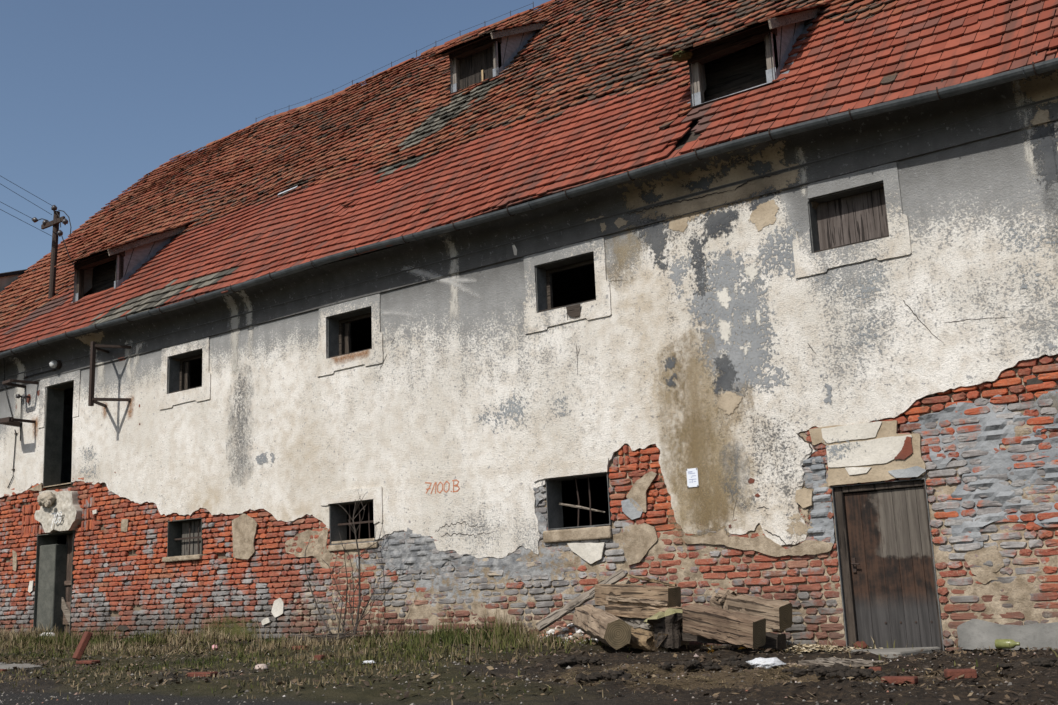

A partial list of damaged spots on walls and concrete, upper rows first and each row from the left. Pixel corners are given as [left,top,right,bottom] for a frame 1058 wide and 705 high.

damp [222,290,254,482]
spalling [0,327,1058,651]
peeling [585,139,807,418]
damp [661,353,756,528]
peeling [815,260,891,353]
peeling [994,218,1058,307]